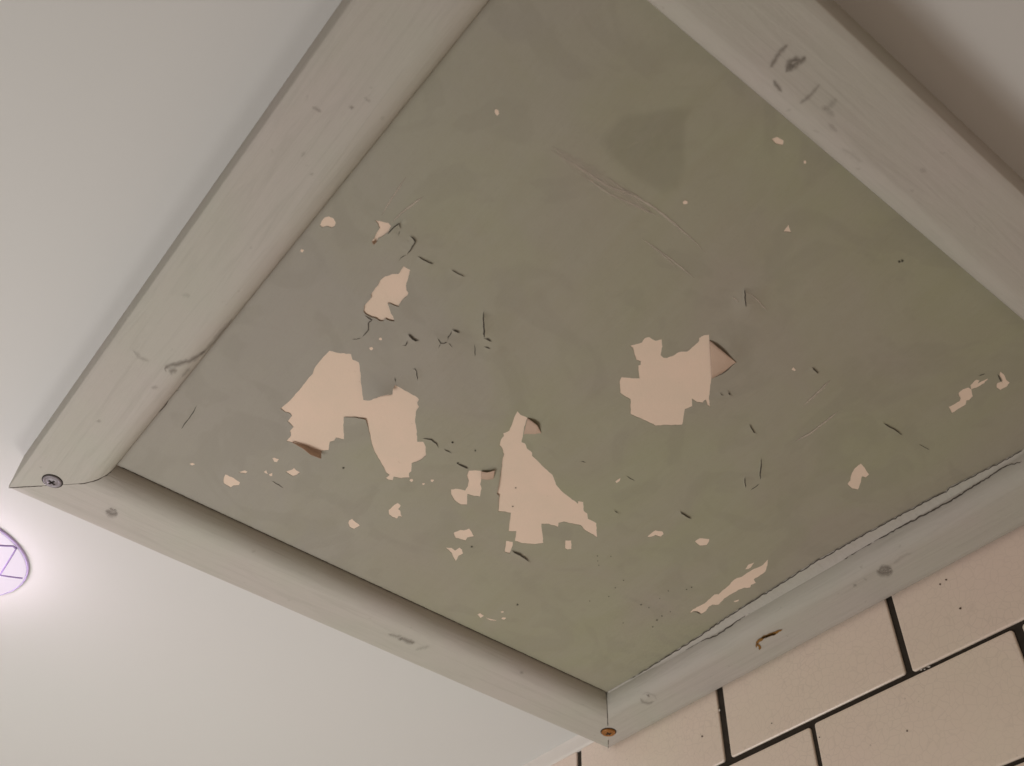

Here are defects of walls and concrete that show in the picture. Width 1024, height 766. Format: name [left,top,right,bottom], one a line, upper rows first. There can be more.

peeling [372,220,391,245]
crack [388,223,463,276]
peeling [364,267,410,321]
crack [403,312,490,349]
peeling [281,351,434,485]
peeling [620,335,736,426]
peeling [949,372,1010,413]
peeling [451,411,597,553]
peeling [848,464,869,490]
peeling [690,560,768,614]